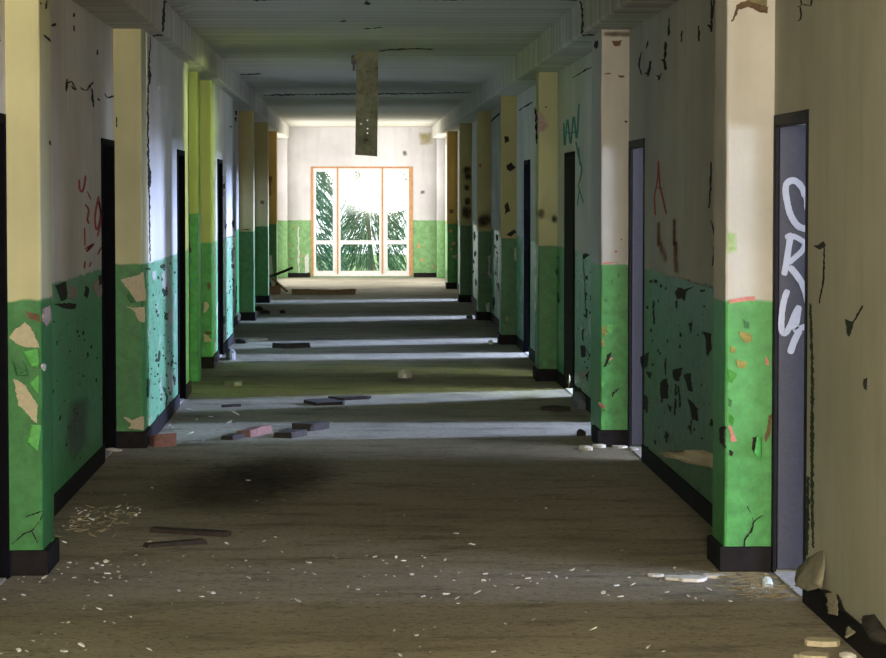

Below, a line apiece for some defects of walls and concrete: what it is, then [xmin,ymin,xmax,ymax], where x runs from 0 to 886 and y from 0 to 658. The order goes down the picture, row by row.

crack [565,0,598,78]
crack [638,24,669,80]
peeling [731,0,768,22]
crack [265,90,356,98]
crack [147,0,167,262]
peeling [9,275,102,451]
peeling [121,262,177,419]
peeling [640,300,703,439]
flaking render [710,398,737,456]
crack [12,510,44,544]
crack [743,506,763,547]
spalling [794,550,845,616]